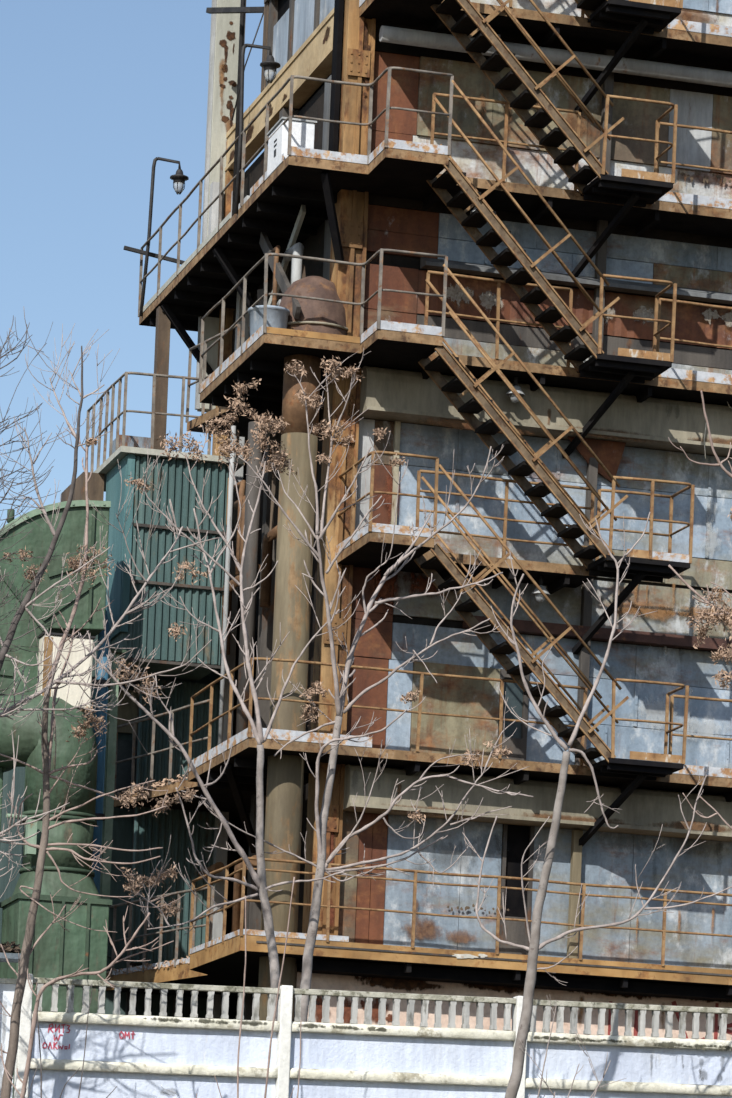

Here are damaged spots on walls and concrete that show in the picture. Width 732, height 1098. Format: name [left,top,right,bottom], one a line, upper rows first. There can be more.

corrosion [219,21,237,164]
peeling [702,308,732,327]
corrosion [620,584,732,621]
corrosion [405,900,475,943]